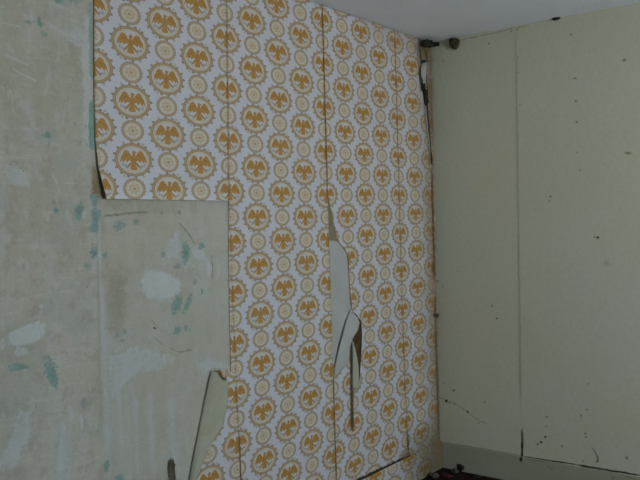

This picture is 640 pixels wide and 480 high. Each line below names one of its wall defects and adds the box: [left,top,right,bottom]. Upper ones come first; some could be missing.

peeling [55,0,96,150]
spalling [167,457,177,480]